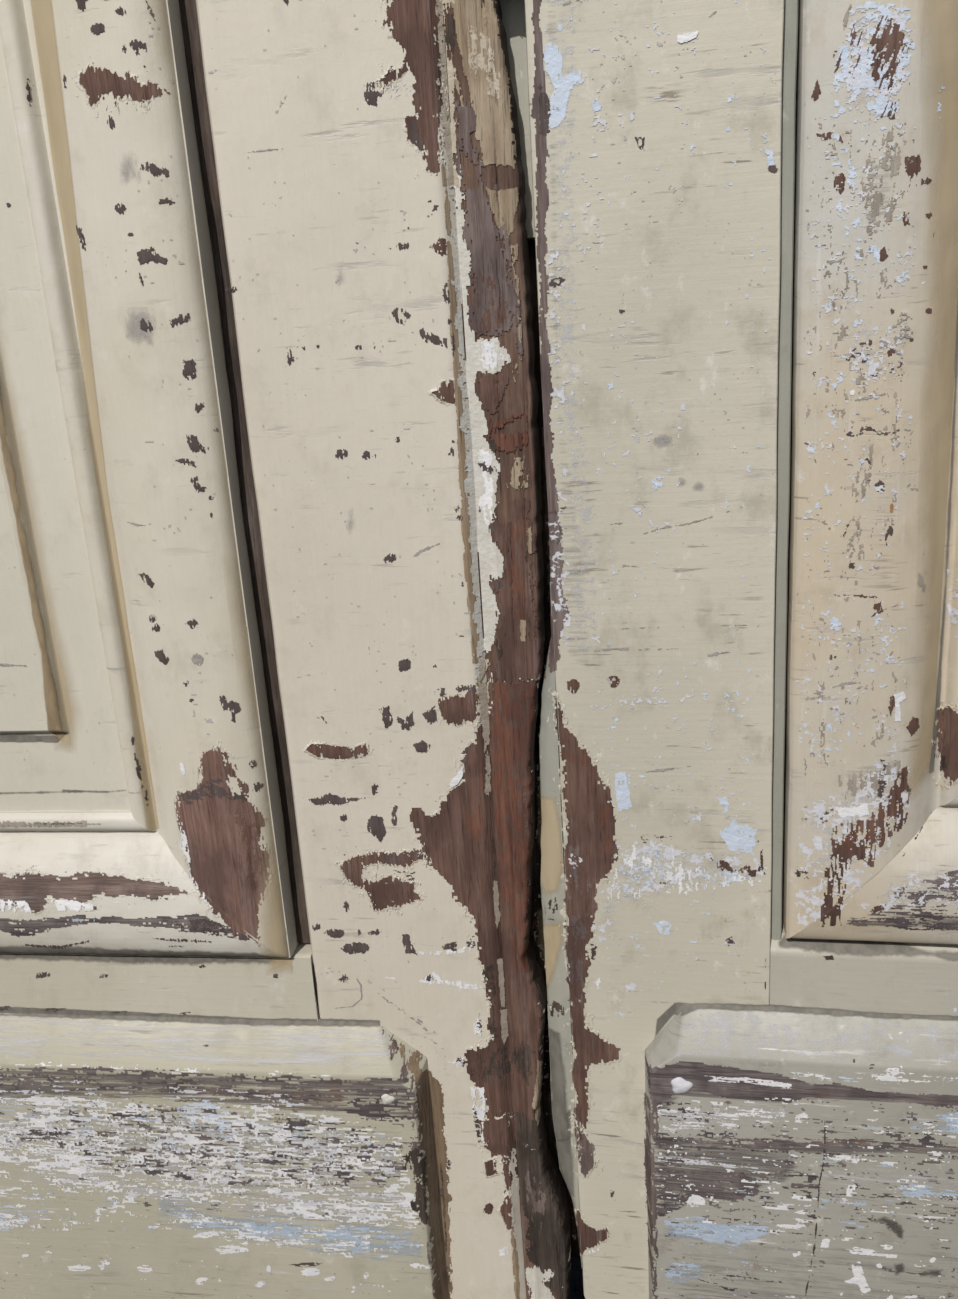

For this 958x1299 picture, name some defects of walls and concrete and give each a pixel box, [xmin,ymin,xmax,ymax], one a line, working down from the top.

peeling [63,64,174,129]
peeling [122,39,147,55]
peeling [726,113,778,173]
peeling [795,1,958,931]
peeling [303,0,768,1231]
peeling [0,737,280,949]
peeling [0,1029,432,1299]
peeling [568,1208,614,1270]
peeling [643,1058,958,1299]